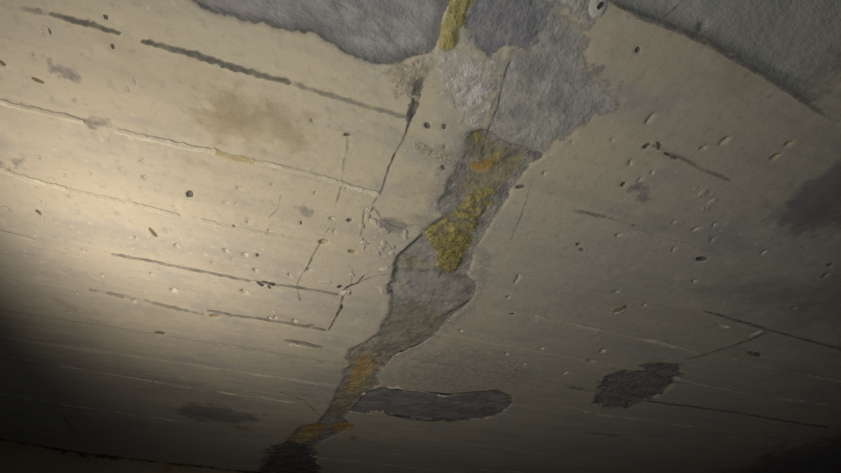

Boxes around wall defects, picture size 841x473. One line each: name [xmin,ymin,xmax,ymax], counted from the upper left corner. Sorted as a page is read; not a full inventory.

peeling [193,0,449,64]
peeling [464,0,618,162]
peeling [607,0,841,103]
crack [360,76,423,235]
leakage [781,165,841,234]
spalling [241,280,276,294]
crack [328,274,385,330]
spalling [594,363,681,409]
leakage [260,442,322,473]